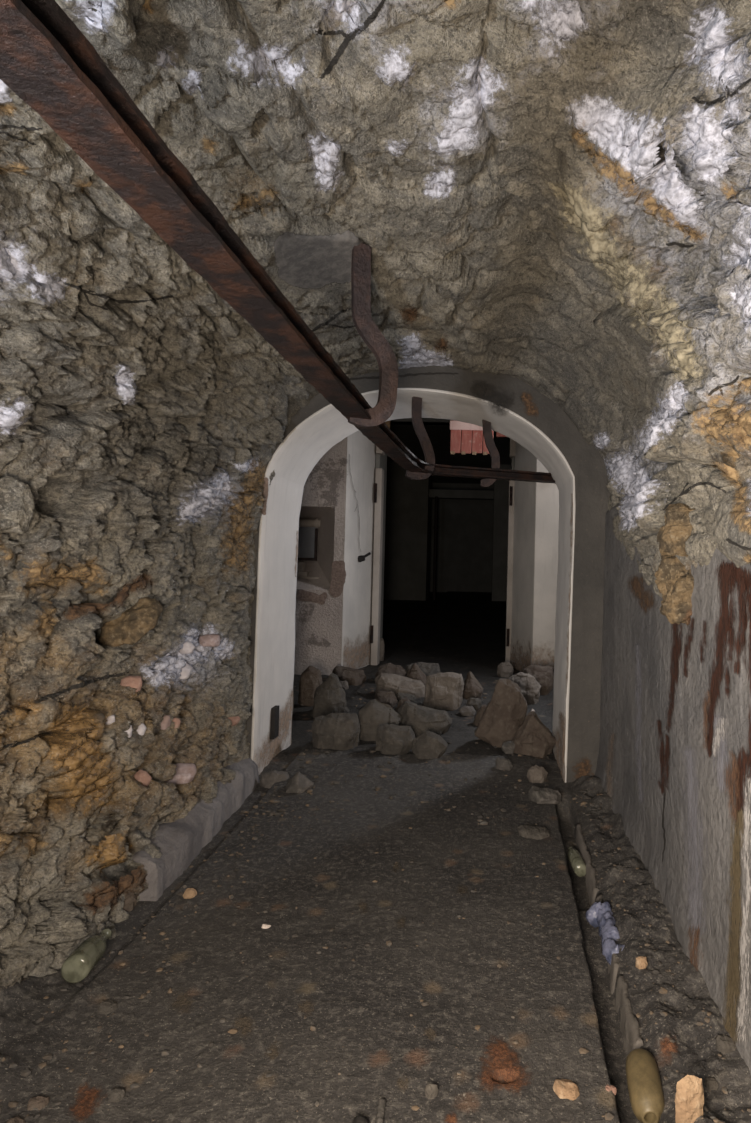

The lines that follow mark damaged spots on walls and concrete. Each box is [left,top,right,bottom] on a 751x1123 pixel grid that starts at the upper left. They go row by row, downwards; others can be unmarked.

damp [75,0,116,30]
damp [324,0,362,31]
damp [229,41,304,86]
damp [376,46,415,86]
damp [309,133,342,191]
damp [424,57,504,197]
damp [568,8,751,271]
damp [550,181,751,534]
damp [0,398,25,434]
damp [140,623,235,688]
corrosion [657,562,751,793]
corrosion [725,709,751,829]